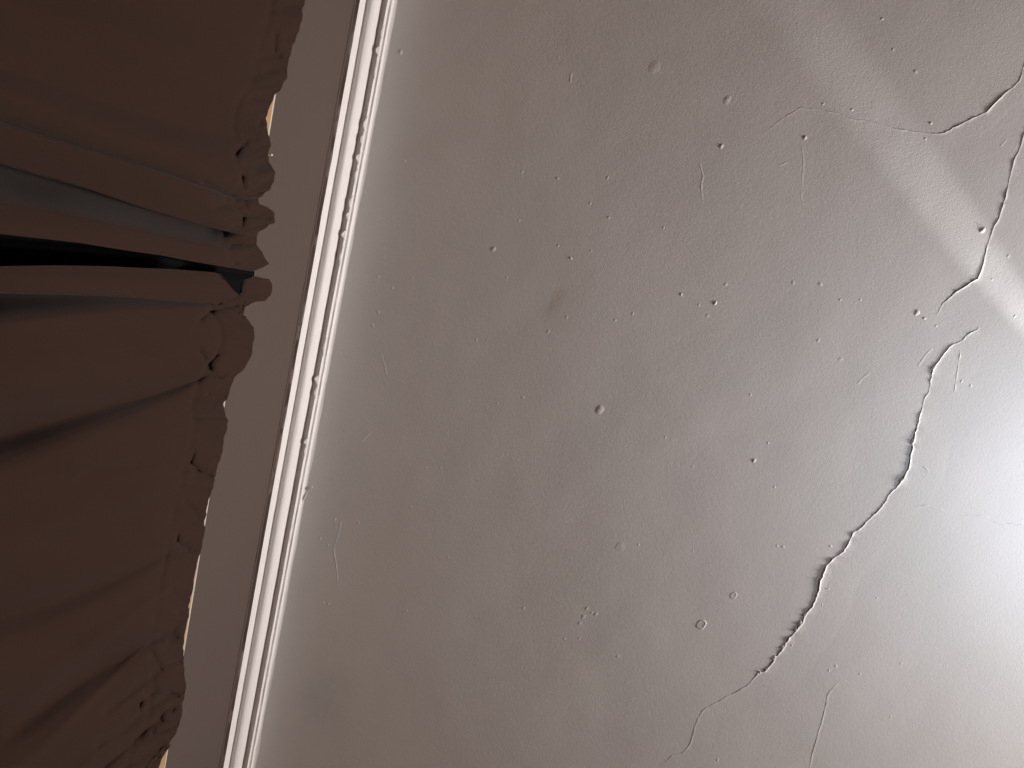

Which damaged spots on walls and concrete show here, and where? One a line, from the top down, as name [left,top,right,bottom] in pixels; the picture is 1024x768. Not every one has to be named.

crack [665,66,1024,768]